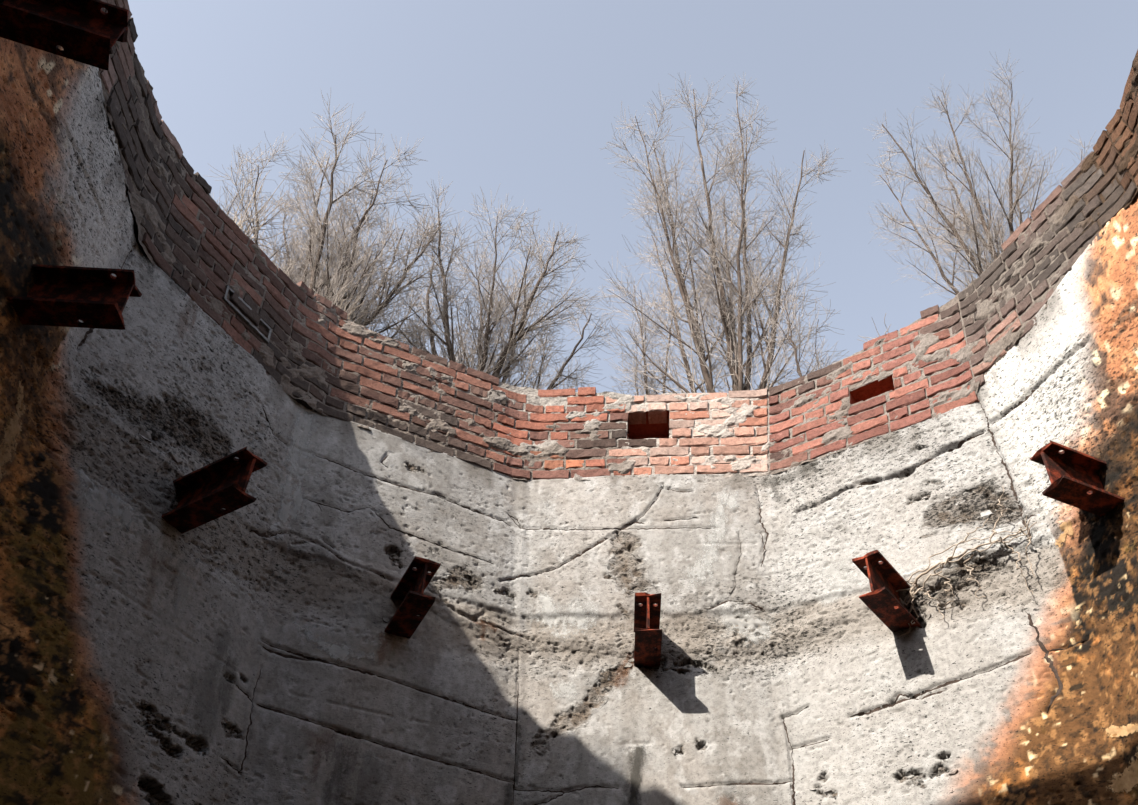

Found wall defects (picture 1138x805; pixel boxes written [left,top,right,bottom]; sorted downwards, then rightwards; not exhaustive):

crack [979,396,1034,546]
spalling [906,477,1031,540]
spalling [901,550,1015,629]
spalling [137,775,171,805]
spalling [136,701,207,760]
spalling [221,719,244,740]
leakage [628,746,645,805]
crack [783,706,829,805]